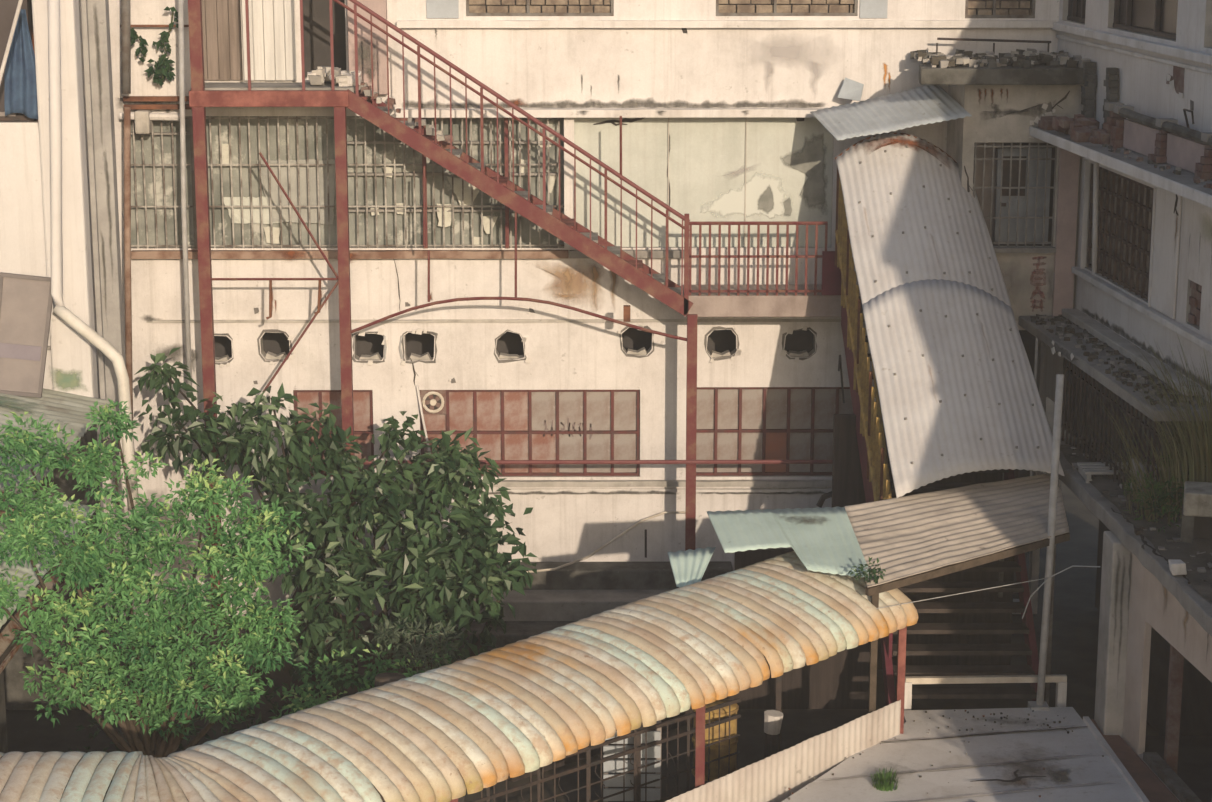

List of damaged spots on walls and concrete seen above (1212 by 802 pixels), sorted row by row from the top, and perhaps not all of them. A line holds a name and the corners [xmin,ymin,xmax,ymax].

spalling [1166,66,1194,110]
peeling [702,169,785,218]
damp [1115,556,1132,652]